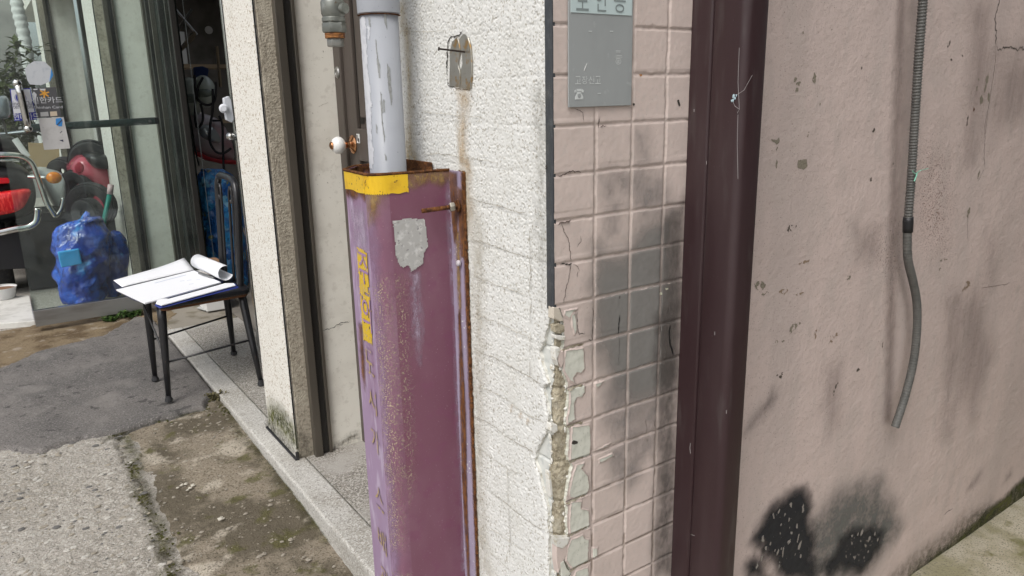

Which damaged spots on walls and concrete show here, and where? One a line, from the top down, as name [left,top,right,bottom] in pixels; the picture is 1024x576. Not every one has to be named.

crack [982,0,1024,173]
rust [343,139,480,576]
crack [559,220,581,298]
spalling [535,306,614,576]